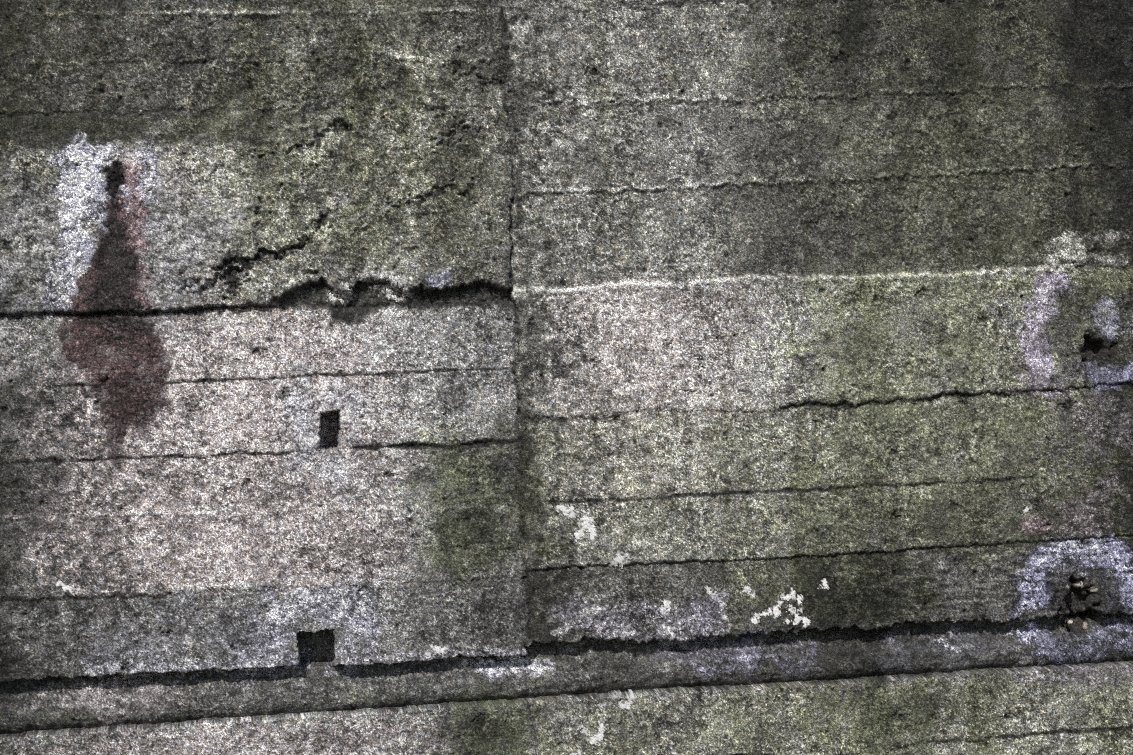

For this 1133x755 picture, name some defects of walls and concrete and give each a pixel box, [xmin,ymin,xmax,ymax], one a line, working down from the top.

damp [1072,0,1133,133]
corrosion [57,160,177,470]
spalling [276,268,512,325]
damp [1018,270,1133,464]
damp [551,551,906,684]
damp [911,469,1133,689]